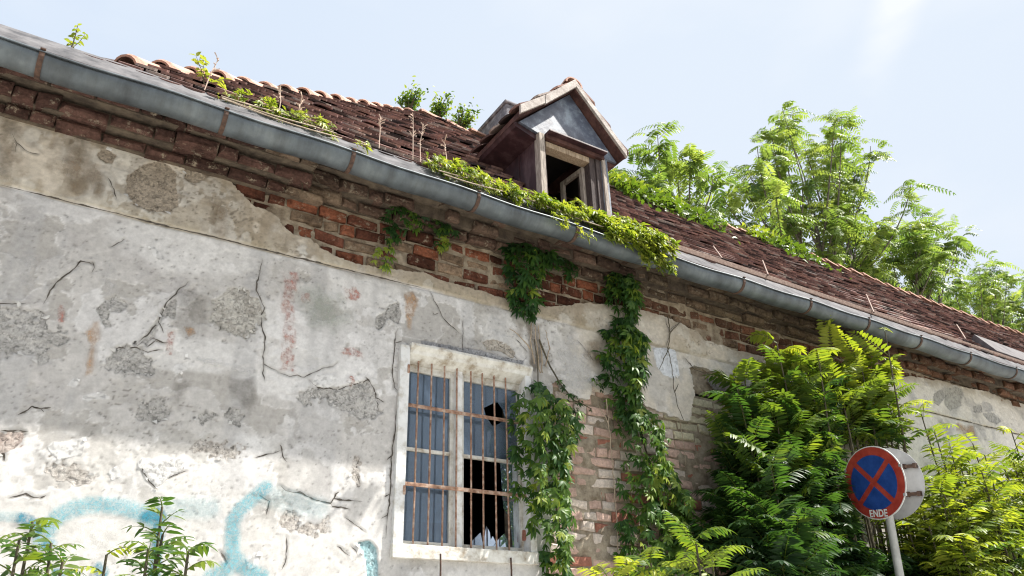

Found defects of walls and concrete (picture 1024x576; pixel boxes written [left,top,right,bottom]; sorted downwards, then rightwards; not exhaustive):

flaking render [124,161,209,215]
spalling [0,301,70,365]
spalling [105,299,177,379]
spalling [208,287,267,339]
flaking render [375,303,403,330]
crack [0,178,463,556]
spalling [297,377,383,419]